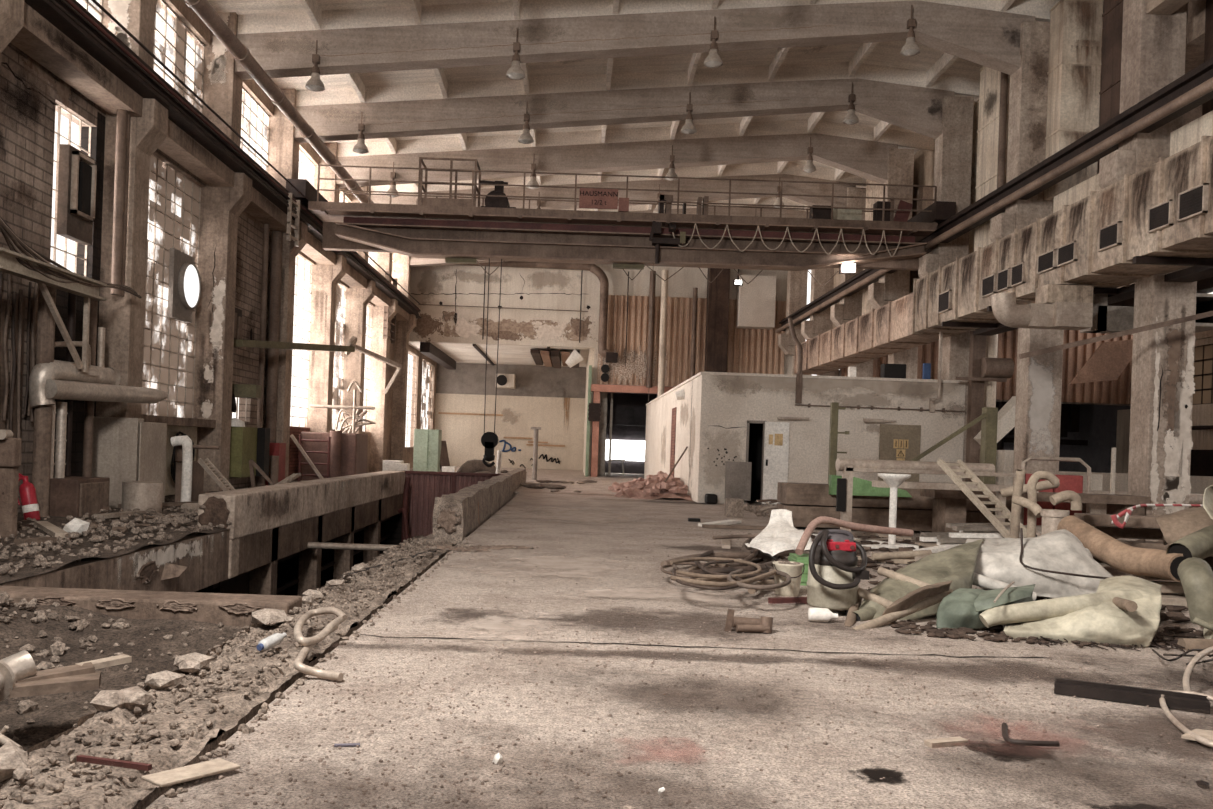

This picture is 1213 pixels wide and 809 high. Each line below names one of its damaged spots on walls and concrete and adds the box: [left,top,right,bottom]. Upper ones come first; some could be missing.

peeling [203,280,226,383]
peeling [413,301,667,385]
peeling [198,397,213,418]
peeling [1150,315,1195,514]
spalling [135,561,160,584]